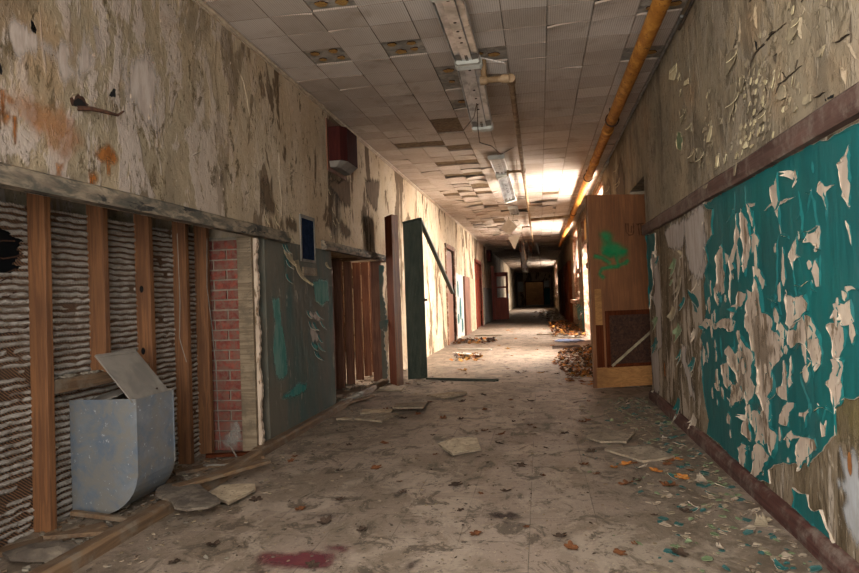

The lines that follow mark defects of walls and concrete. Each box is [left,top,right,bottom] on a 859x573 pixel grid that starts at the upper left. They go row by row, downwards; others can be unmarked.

rust [0,89,17,144]
rust [89,145,116,184]
peeling [381,38,427,56]
peeling [395,99,498,206]
peeling [434,65,461,89]
peeling [669,63,689,97]
peeling [688,82,751,167]
peeling [715,110,766,176]
peeling [763,70,787,100]
peeling [817,145,852,211]
peeling [665,170,859,478]
peeling [574,250,822,573]